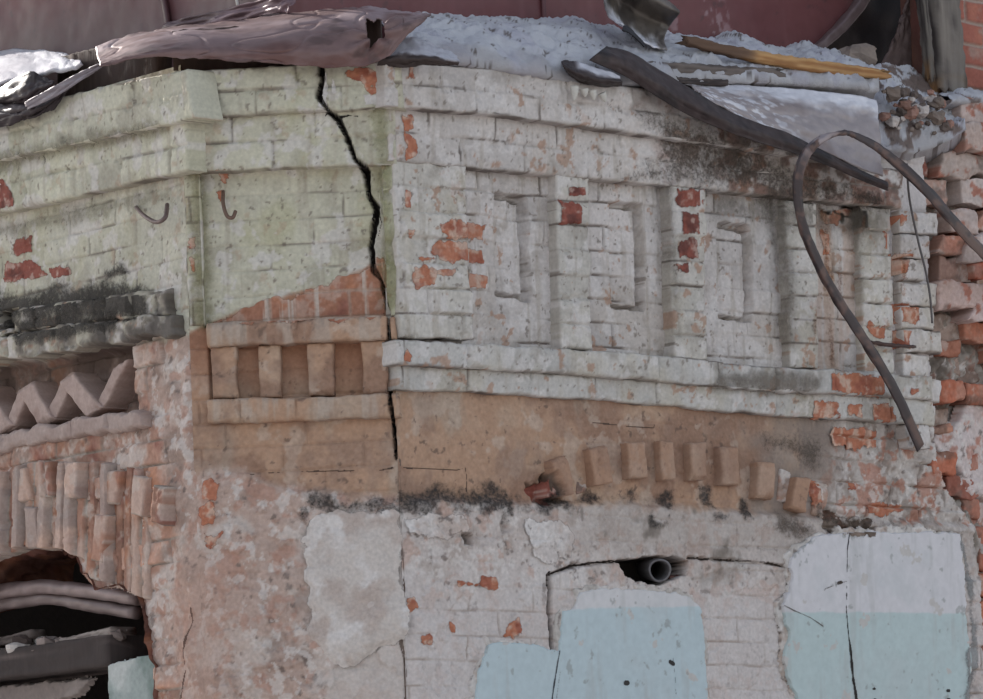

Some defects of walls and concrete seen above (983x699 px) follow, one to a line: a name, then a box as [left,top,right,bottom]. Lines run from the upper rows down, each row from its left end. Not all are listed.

peeling [402,114,418,161]
peeling [0,179,14,209]
crack [318,68,391,337]
peeling [3,235,72,283]
water stain [0,264,148,346]
peeling [214,257,386,325]
peeling [412,219,488,290]
peeling [810,372,896,452]
spalling [524,480,557,506]
crack [824,533,858,699]